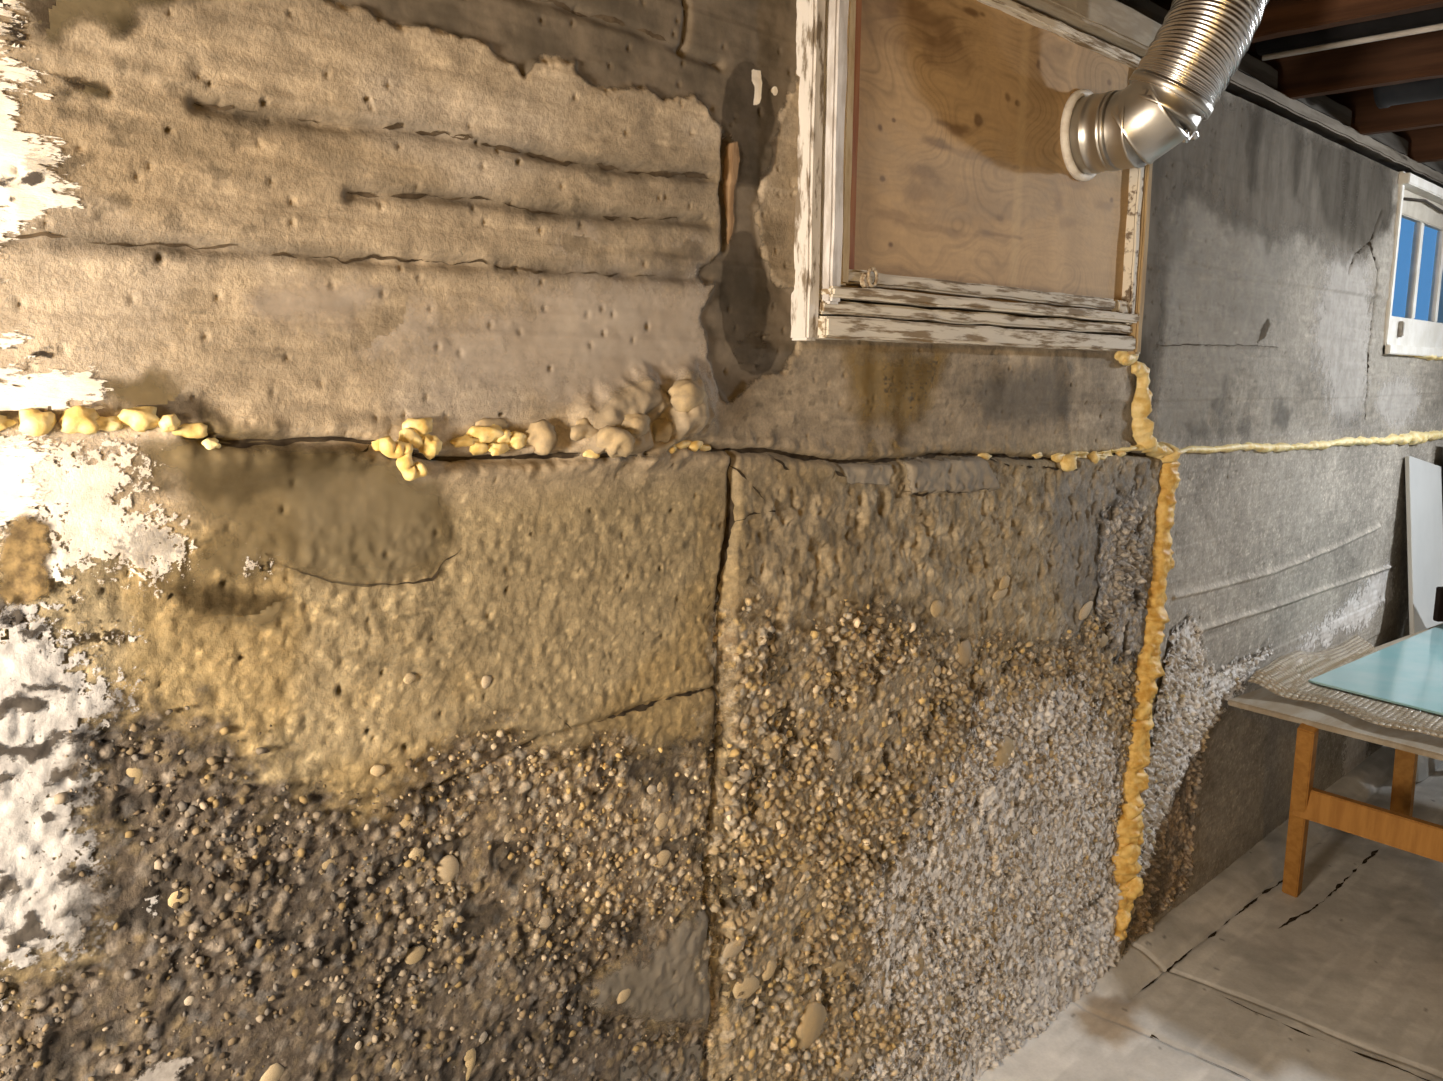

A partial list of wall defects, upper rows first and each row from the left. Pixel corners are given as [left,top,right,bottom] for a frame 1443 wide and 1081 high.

peeling [0,0,86,260]
crack [7,232,655,277]
crack [194,103,708,179]
damp [330,0,798,403]
peeling [0,329,199,1012]
damp [102,371,181,409]
damp [191,597,290,627]
peeling [243,548,283,580]
crack [203,435,376,452]
damp [142,416,451,589]
crack [412,443,1078,1081]
crack [1131,848,1380,999]